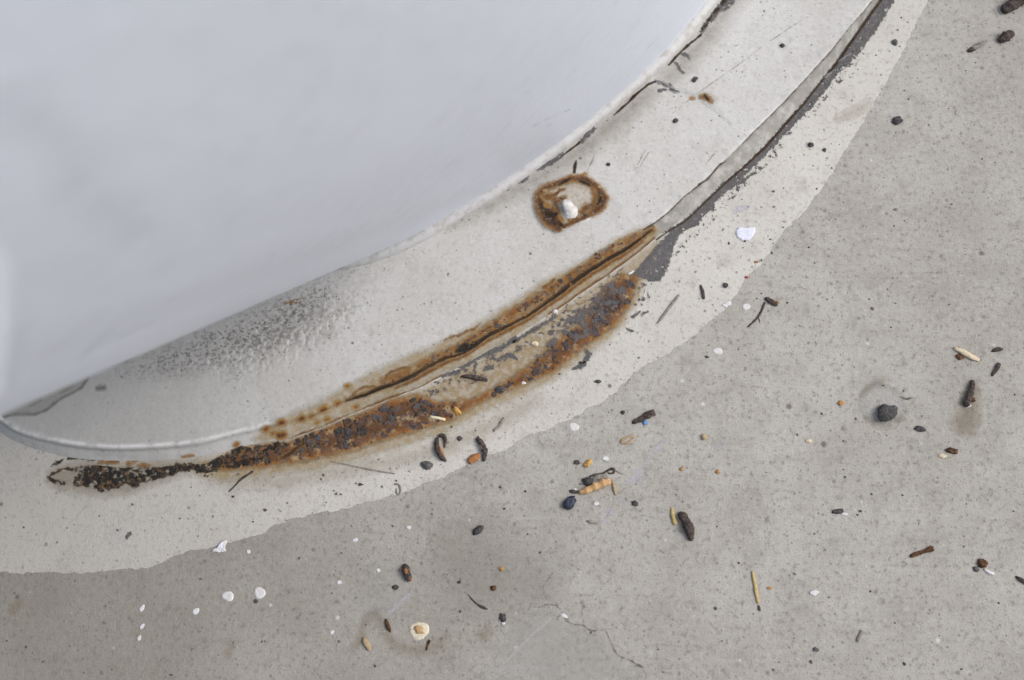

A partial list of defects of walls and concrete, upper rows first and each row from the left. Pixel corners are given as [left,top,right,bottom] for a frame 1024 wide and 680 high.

rust [534,172,610,232]
peeling [626,0,894,334]
rust [182,227,657,478]